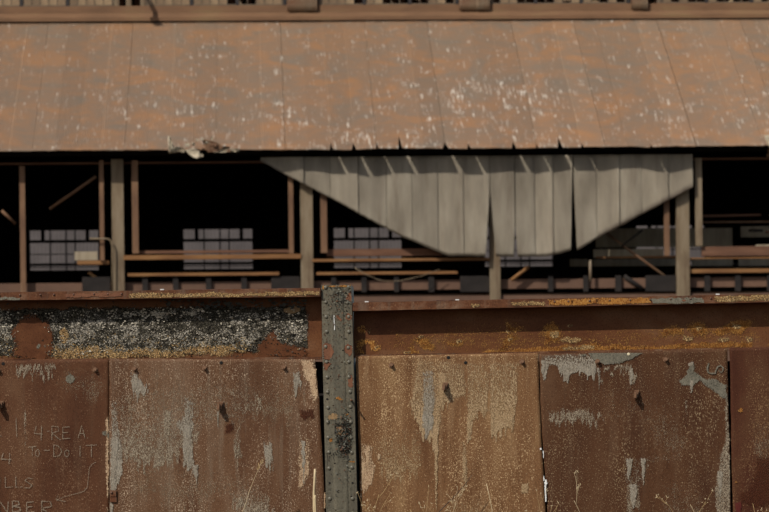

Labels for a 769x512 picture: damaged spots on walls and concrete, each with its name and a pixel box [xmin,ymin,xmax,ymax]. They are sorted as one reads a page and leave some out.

corrosion [512,297,651,306]
corrosion [10,313,246,359]
peeling [0,296,309,359]
corrosion [356,319,769,354]